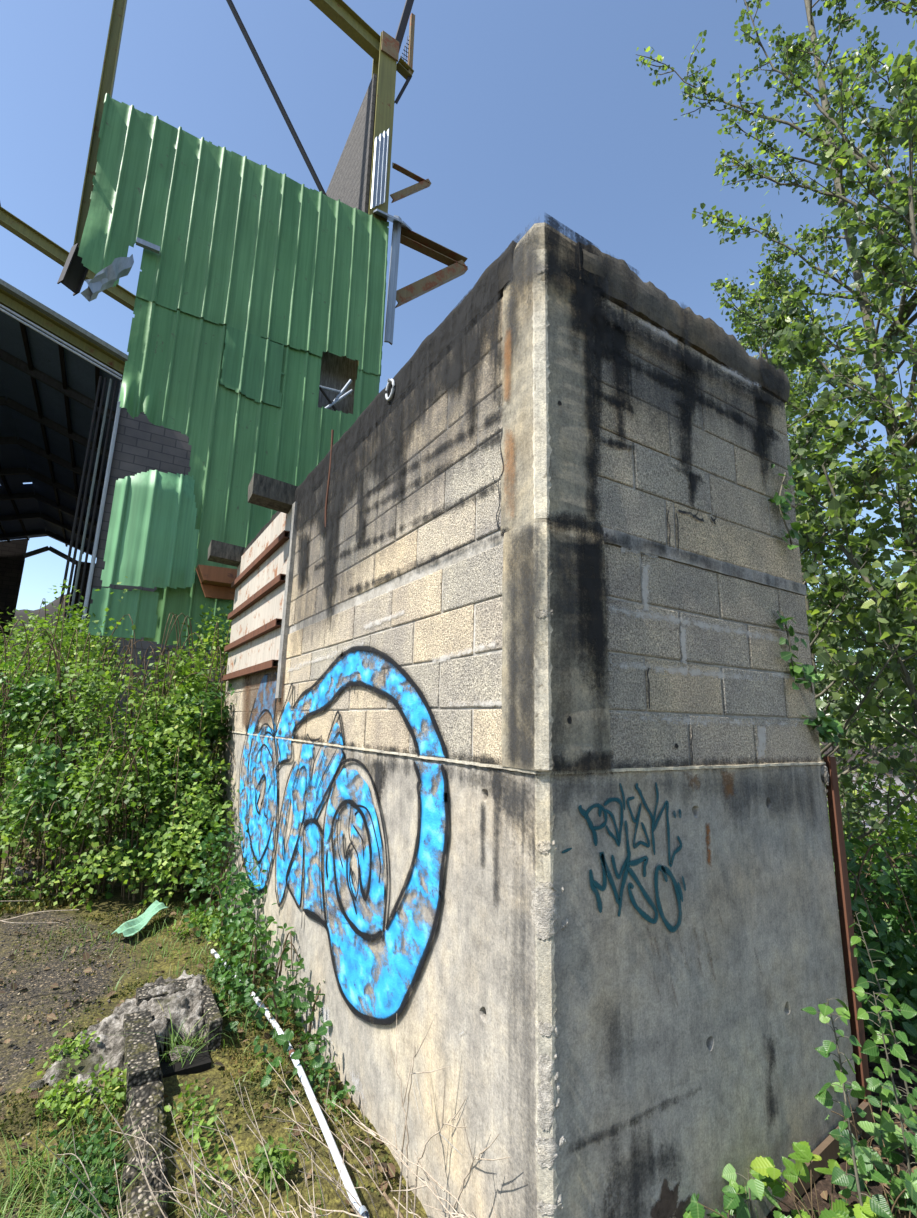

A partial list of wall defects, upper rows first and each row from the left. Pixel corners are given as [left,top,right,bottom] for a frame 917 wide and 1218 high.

water stain [242,215,818,904]
water stain [609,1135,676,1218]